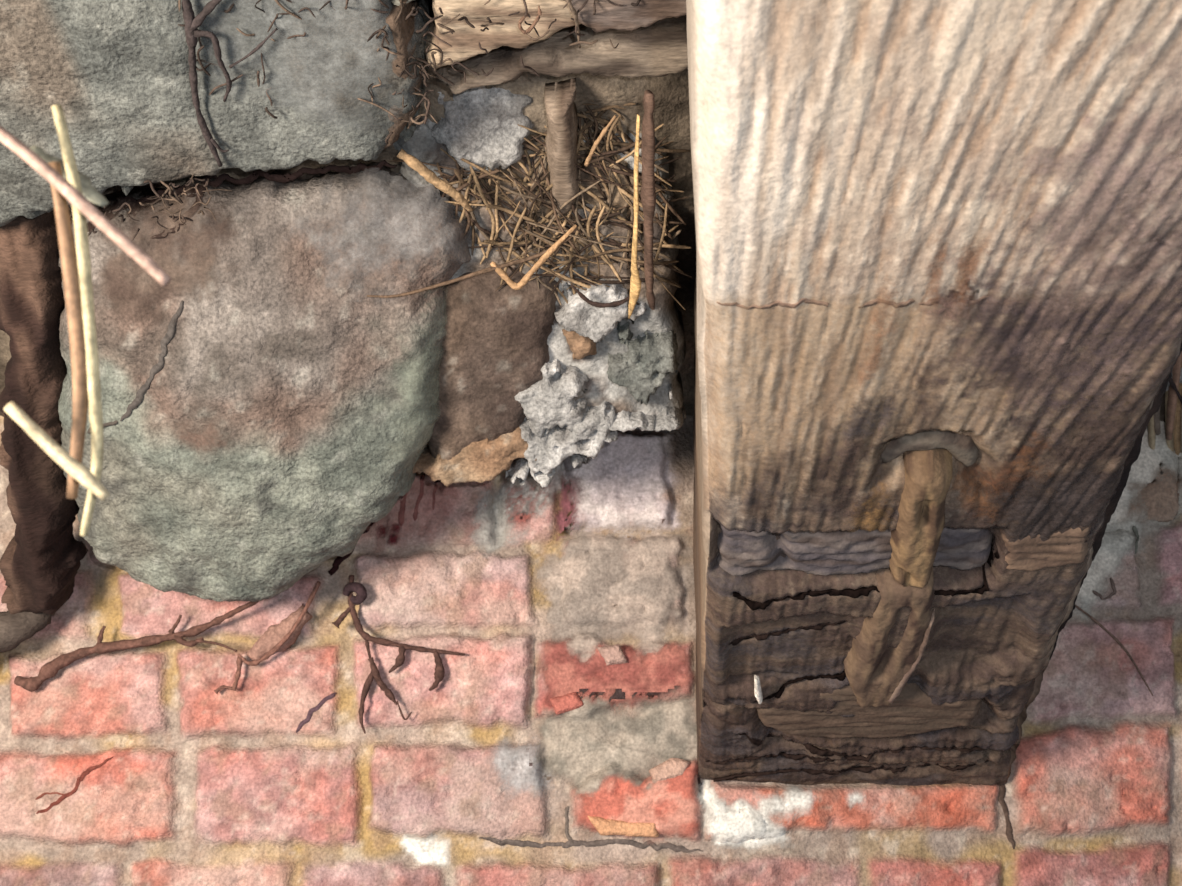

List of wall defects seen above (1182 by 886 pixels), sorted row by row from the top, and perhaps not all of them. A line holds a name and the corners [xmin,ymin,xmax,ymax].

damp [698,117,1182,848]
crack [729,586,880,646]
spalling [543,638,690,715]
crack [755,670,846,702]
spalling [580,758,699,837]
crack [697,733,1015,849]